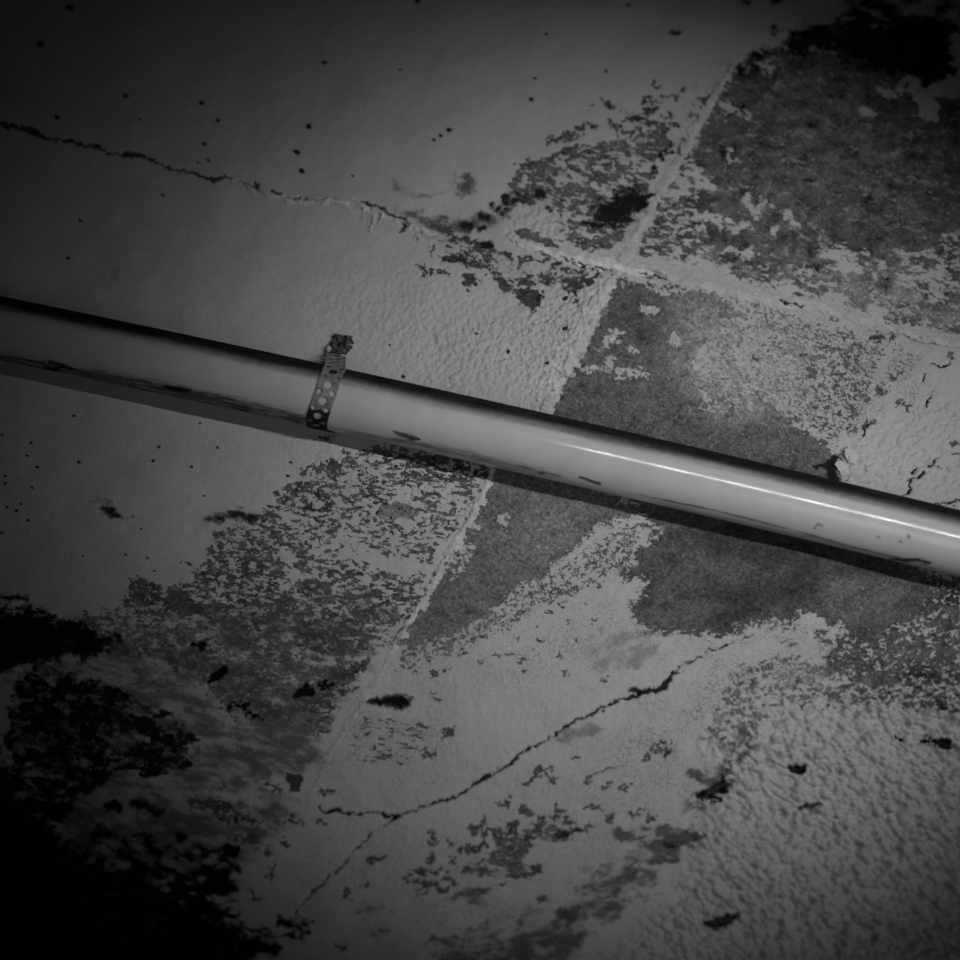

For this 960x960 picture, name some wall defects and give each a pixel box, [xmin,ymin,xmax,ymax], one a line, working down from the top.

crack [0,121,315,201]
crack [360,200,410,229]
peeling [415,41,960,482]
crack [871,331,954,407]
crack [902,453,959,496]
peeling [82,444,647,736]
peeling [700,575,960,745]
leakage [0,592,314,960]
peeling [348,717,455,766]
crack [295,635,753,913]
peeling [522,764,561,787]
peeling [402,795,615,900]